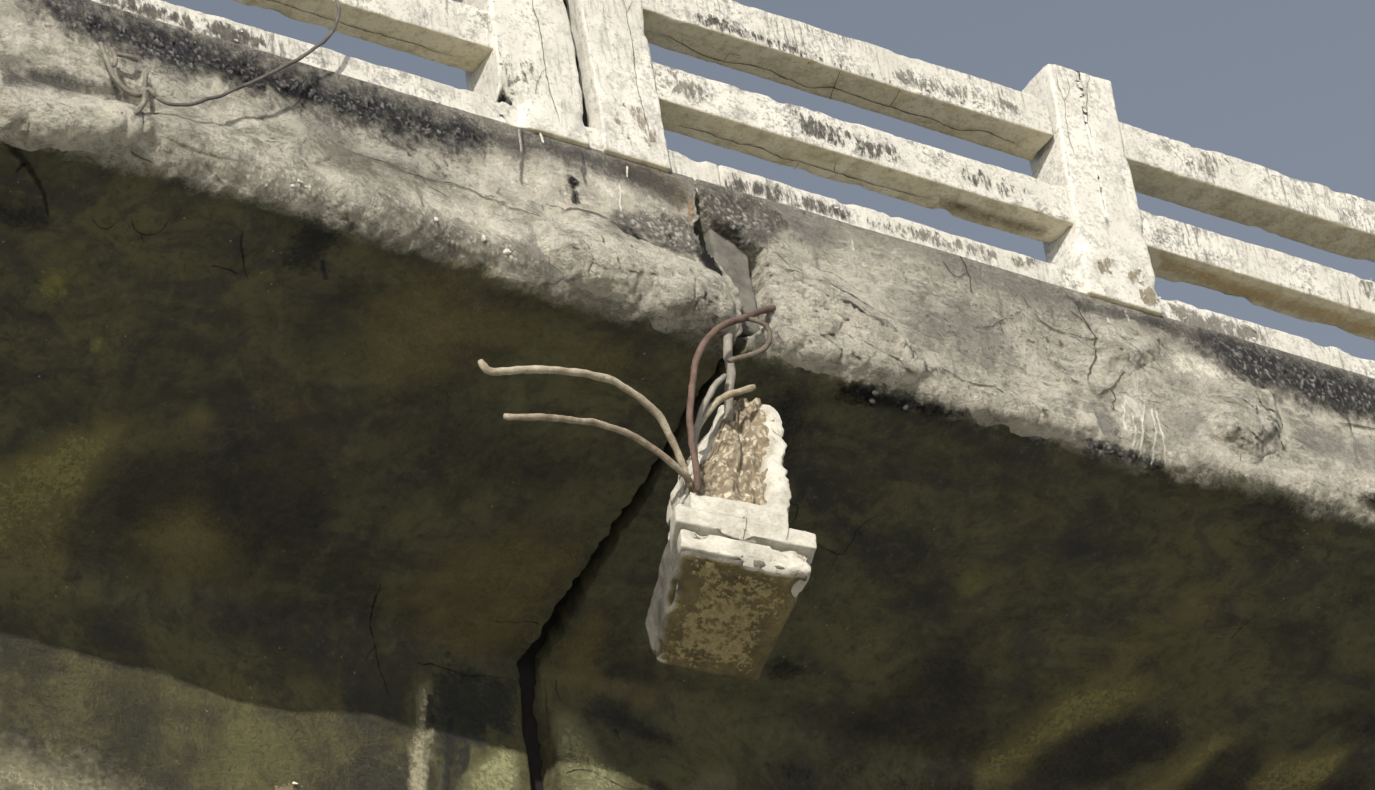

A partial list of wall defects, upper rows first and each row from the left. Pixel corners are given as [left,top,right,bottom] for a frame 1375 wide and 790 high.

damp [0,66,91,93]
crack [532,0,560,118]
crack [1056,74,1092,153]
damp [419,194,558,271]
damp [1056,298,1231,383]
damp [0,421,124,560]
damp [1095,403,1340,511]
peeling [659,556,791,675]
damp [410,654,518,790]
damp [558,694,671,790]
damp [969,676,1150,790]
damp [1137,736,1361,790]